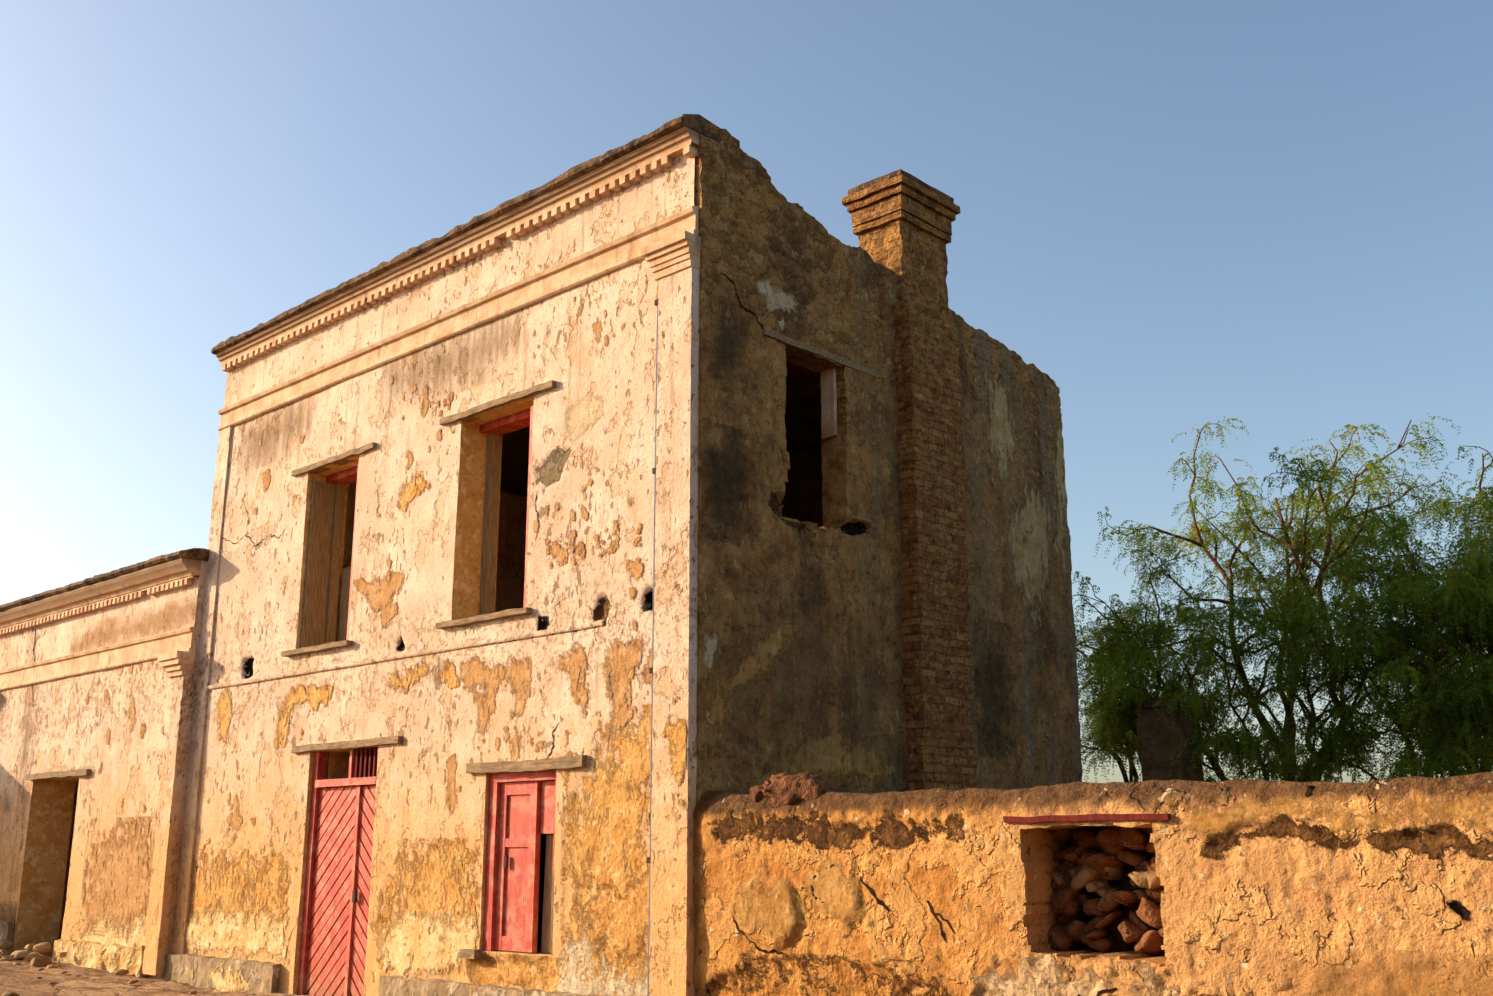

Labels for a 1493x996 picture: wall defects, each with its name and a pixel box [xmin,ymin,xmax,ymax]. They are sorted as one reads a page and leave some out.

peeling [573,296,625,346]
peeling [376,366,456,517]
peeling [86,678,164,739]
peeling [273,680,333,749]
peeling [351,393,686,992]
peeling [79,798,156,940]
peeling [188,774,291,929]
crack [810,864,890,912]
crack [926,900,955,943]
spalling [705,950,951,996]
spalling [966,954,1221,996]
crack [1078,987,1117,996]